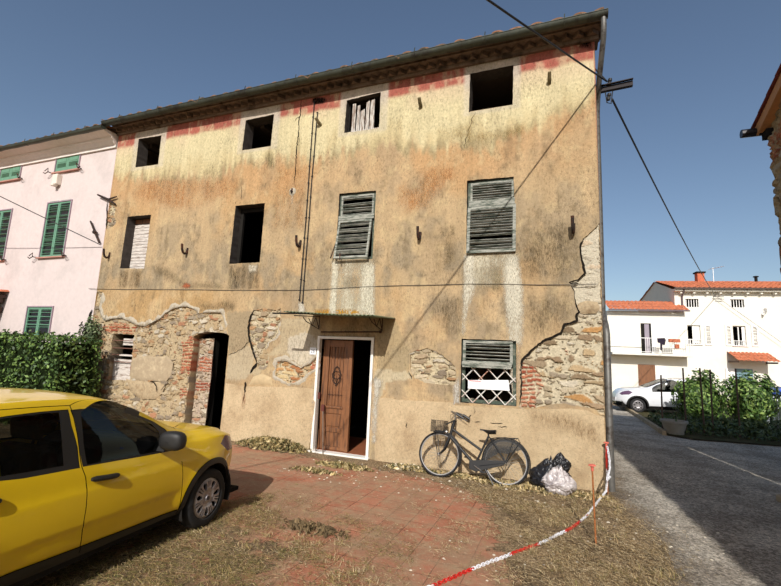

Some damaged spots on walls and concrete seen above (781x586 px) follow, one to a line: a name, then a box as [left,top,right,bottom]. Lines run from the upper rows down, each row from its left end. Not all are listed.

flaking render [92,290,228,423]
flaking render [249,307,321,386]
leakage [329,261,375,315]
flaking render [410,348,457,385]
leakage [442,254,524,392]
flaking render [510,224,605,418]